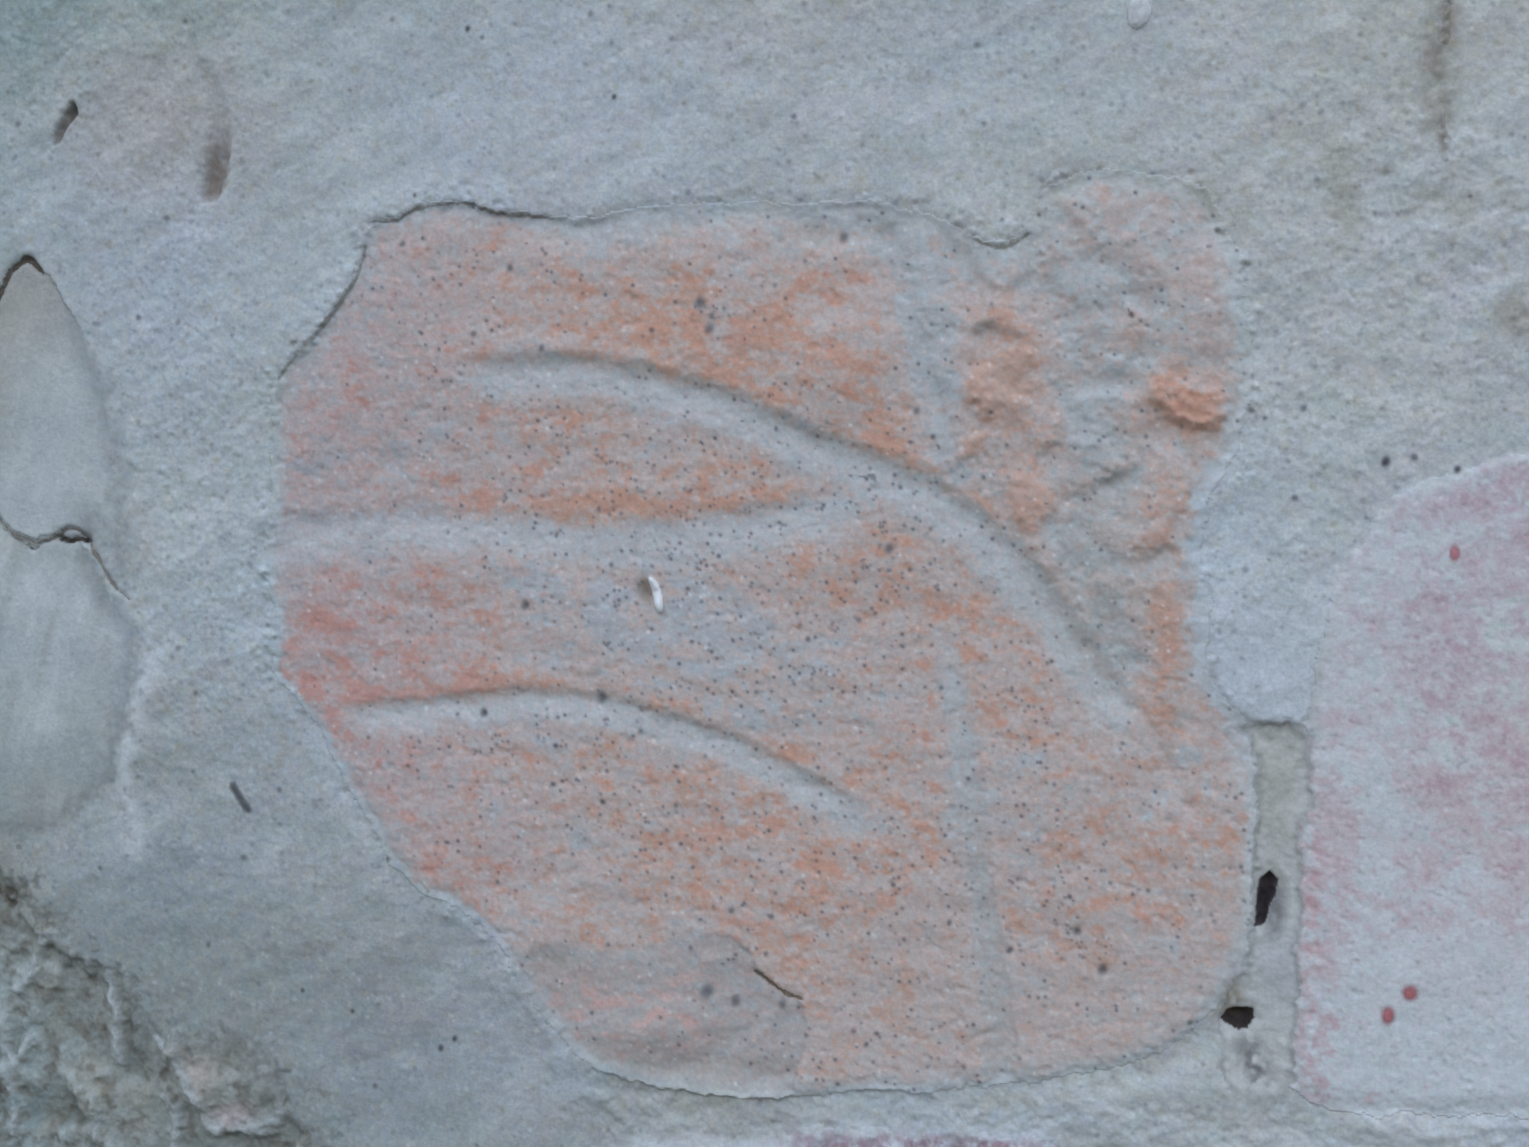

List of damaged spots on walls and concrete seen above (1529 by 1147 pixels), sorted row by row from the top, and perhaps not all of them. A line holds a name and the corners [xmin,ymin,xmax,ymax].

peeling [0,262,126,567]
spalling [0,870,334,1147]